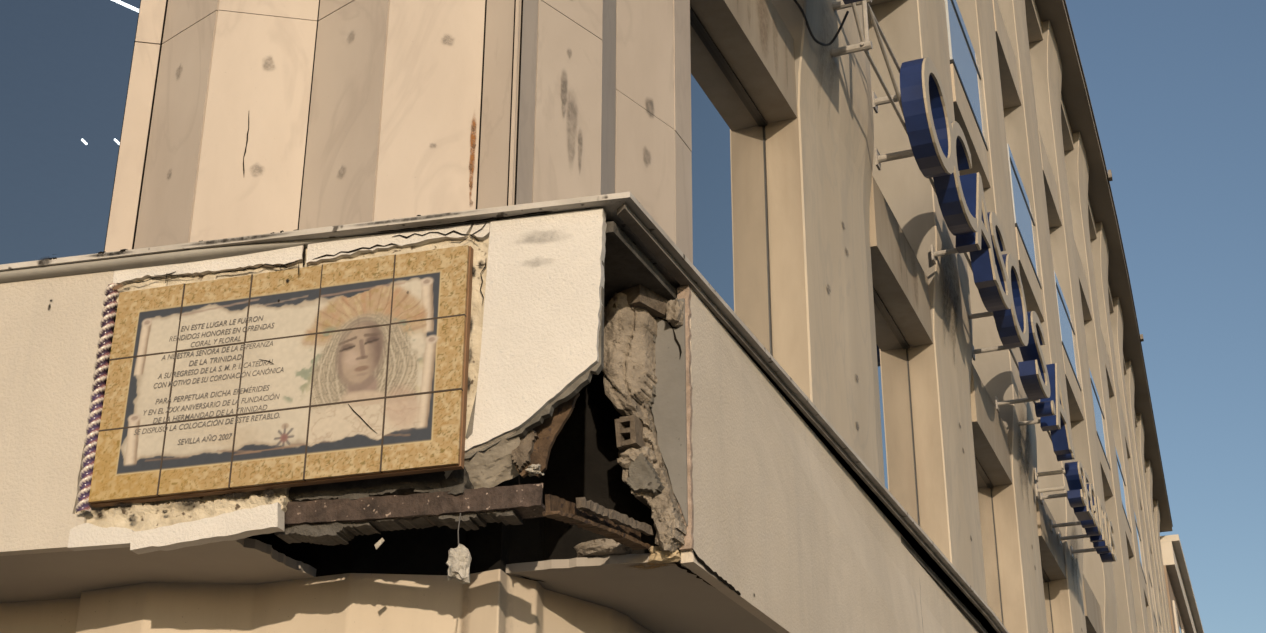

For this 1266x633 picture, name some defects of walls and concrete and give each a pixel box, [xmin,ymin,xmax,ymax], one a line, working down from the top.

crack [242,114,250,175]
spalling [68,208,694,563]